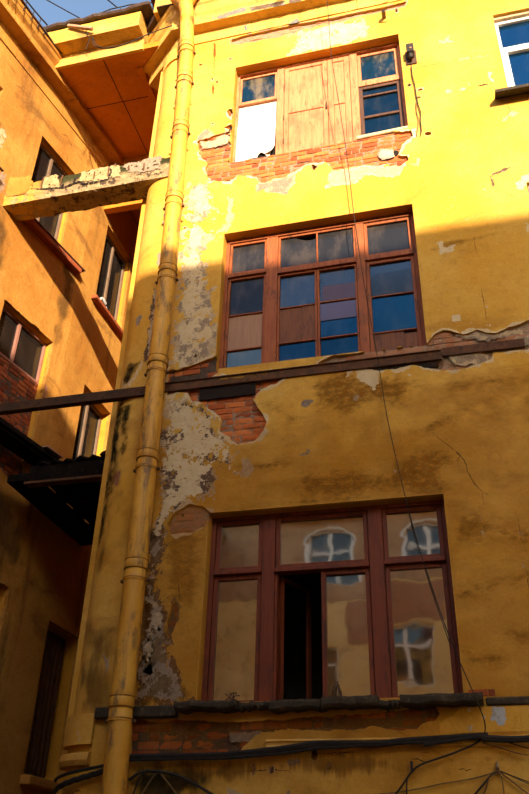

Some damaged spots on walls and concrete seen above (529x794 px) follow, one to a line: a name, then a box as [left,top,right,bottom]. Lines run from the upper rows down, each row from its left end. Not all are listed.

peeling [229,0,408,56]
peeling [0,171,64,197]
spalling [79,156,162,181]
spalling [165,108,429,382]
spalling [316,314,529,390]
water stain [317,373,404,409]
water stain [100,401,130,537]
water stain [303,451,448,494]
peeling [134,378,287,706]